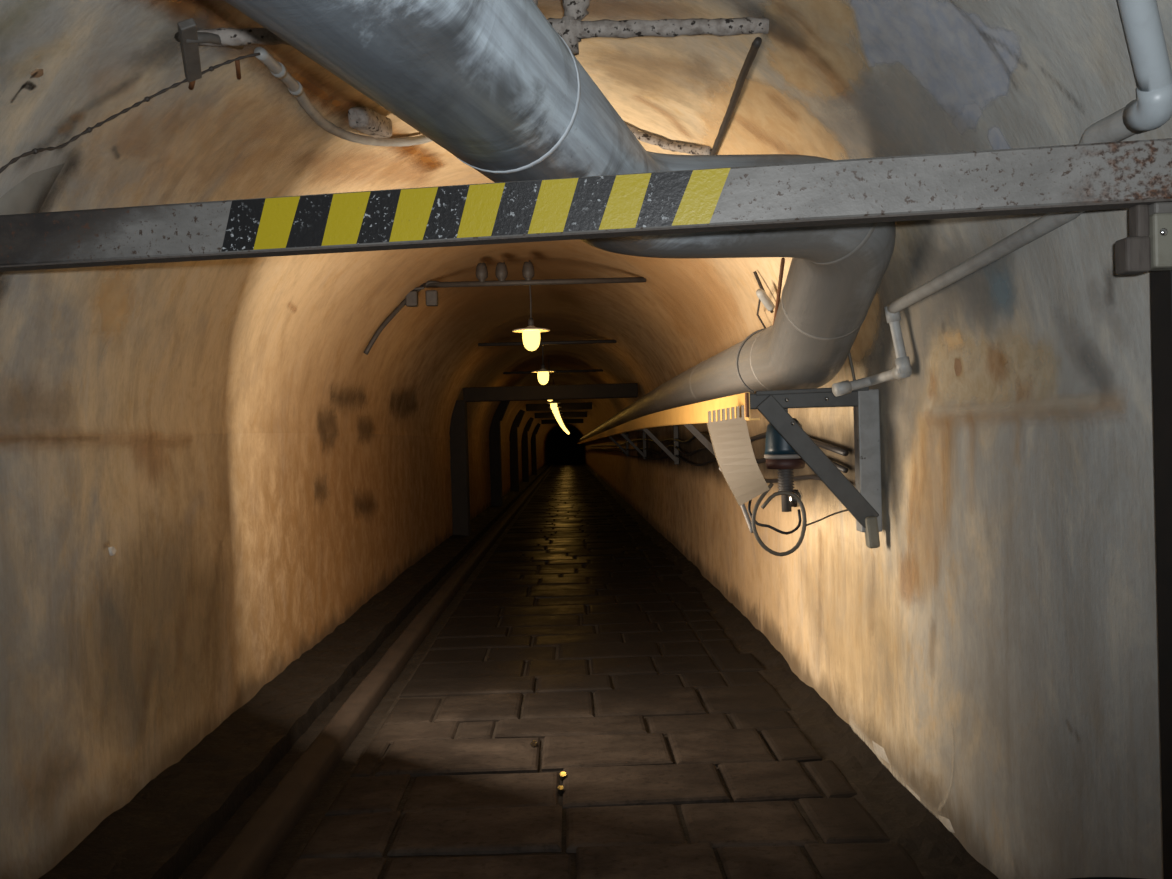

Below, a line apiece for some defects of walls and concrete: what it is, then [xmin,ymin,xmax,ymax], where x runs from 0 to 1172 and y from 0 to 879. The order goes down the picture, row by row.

damp [705,0,856,160]
peeling [849,0,1019,134]